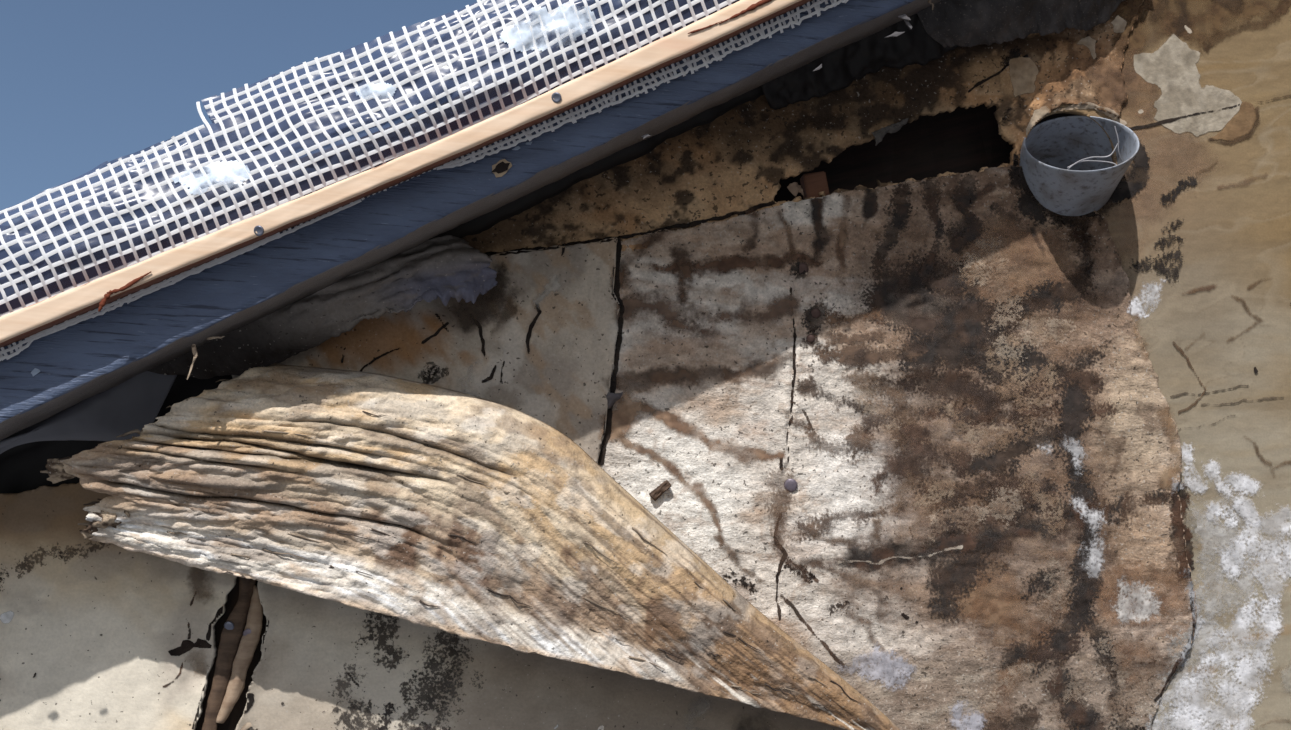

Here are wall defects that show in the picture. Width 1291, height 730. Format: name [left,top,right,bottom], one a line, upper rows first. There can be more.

peeling [1009,57,1039,97]
peeling [1111,15,1127,33]
peeling [1026,25,1259,145]
crack [341,291,546,384]
crack [485,201,777,466]
water stain [600,354,794,582]
water stain [612,197,847,337]
crack [779,288,813,470]
water stain [785,140,1291,730]
crack [722,518,845,667]
crack [244,693,258,730]
water stain [323,612,484,730]